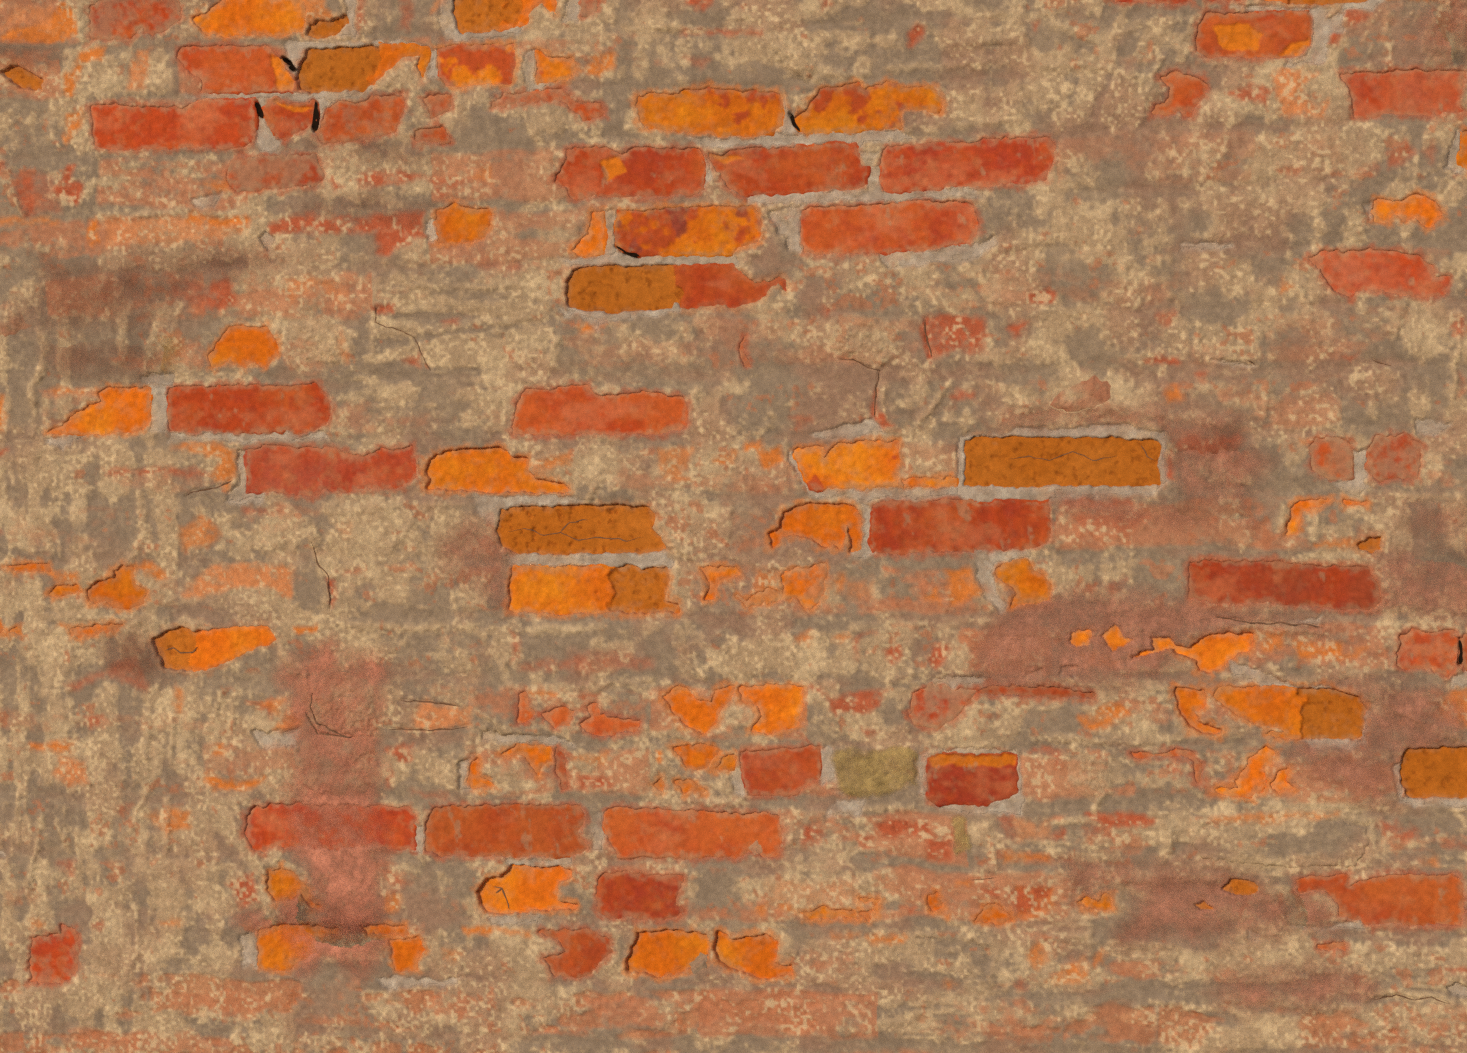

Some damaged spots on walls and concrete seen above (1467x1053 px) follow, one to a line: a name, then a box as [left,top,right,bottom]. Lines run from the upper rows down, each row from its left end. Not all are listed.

peeling [91,0,605,151]
peeling [1196,0,1367,59]
peeling [555,81,1056,314]
spalling [154,625,276,672]
peeling [47,325,688,615]
peeling [245,743,587,914]
peeling [538,684,822,979]
spalling [770,436,1161,609]
peeling [925,751,1019,807]
spalling [1070,625,1365,799]
peeling [1188,537,1381,610]
spalling [1400,746,1467,799]